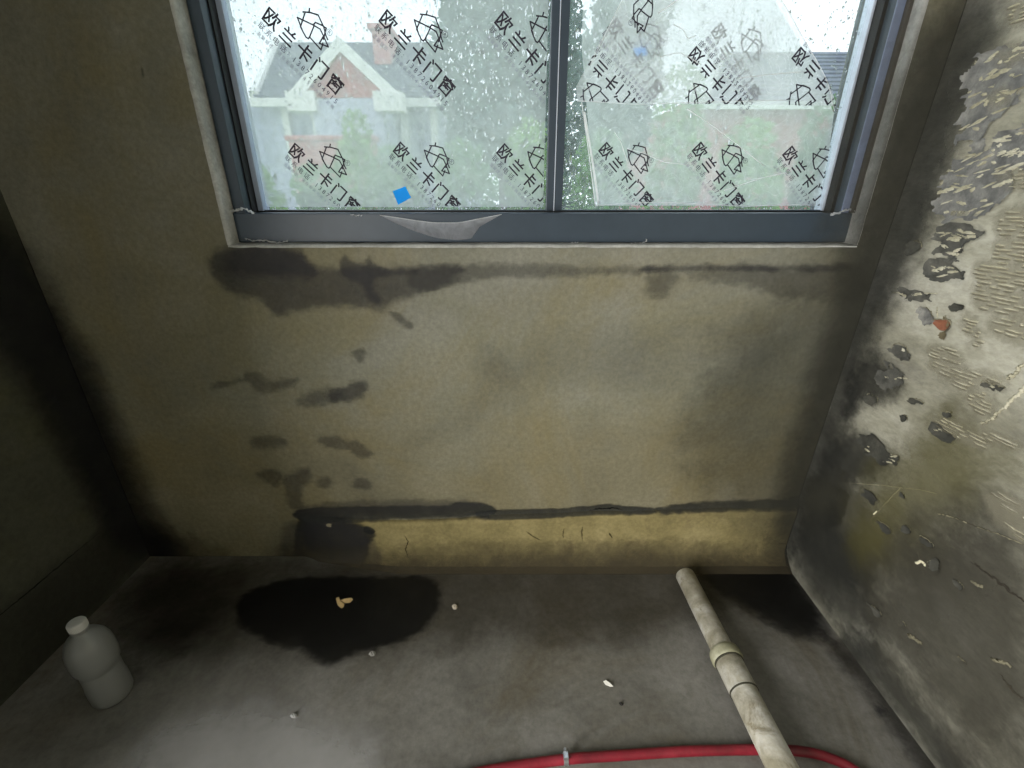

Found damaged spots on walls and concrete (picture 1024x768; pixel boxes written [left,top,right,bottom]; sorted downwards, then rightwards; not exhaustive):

flaking render [904,41,1024,282]
flaking render [897,287,965,340]
water stain [293,0,1024,768]
flaking render [856,433,900,466]
flaking render [863,343,911,406]
flaking render [899,398,924,422]
flaking render [928,411,958,443]
flaking render [980,380,1006,392]
water stain [237,576,440,664]